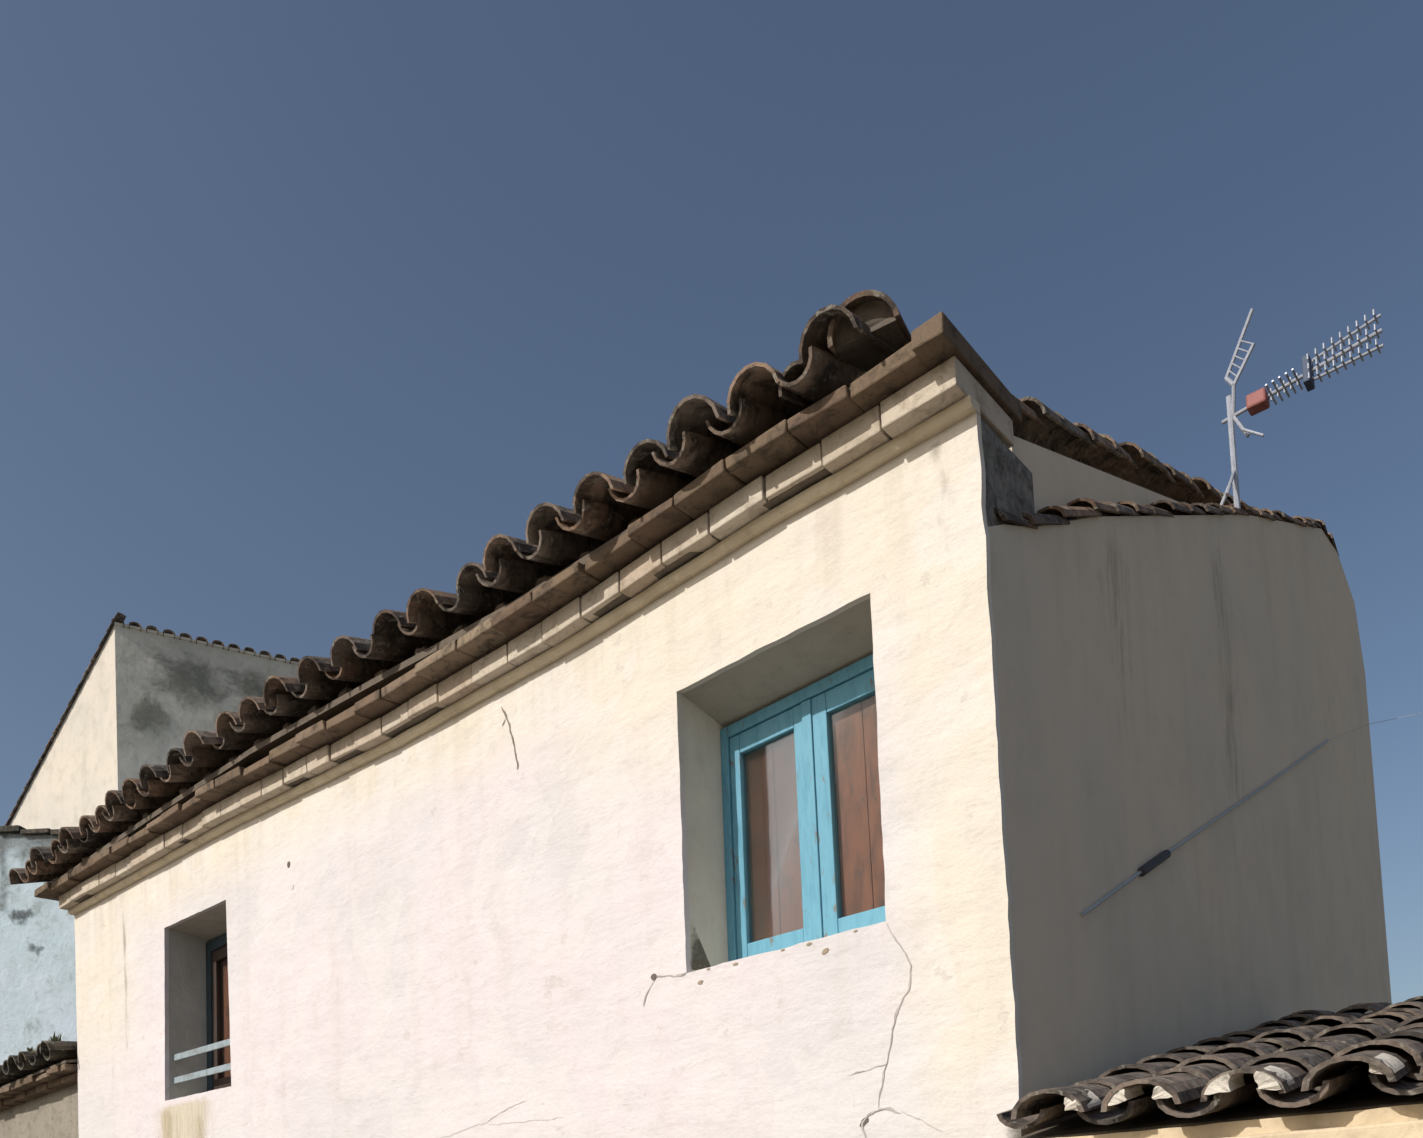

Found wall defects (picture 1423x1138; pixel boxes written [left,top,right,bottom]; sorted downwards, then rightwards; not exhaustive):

crack [501,707,518,770]
water stain [0,833,59,906]
crack [850,925,941,1138]
water stain [163,1102,205,1138]
crack [435,1100,562,1138]